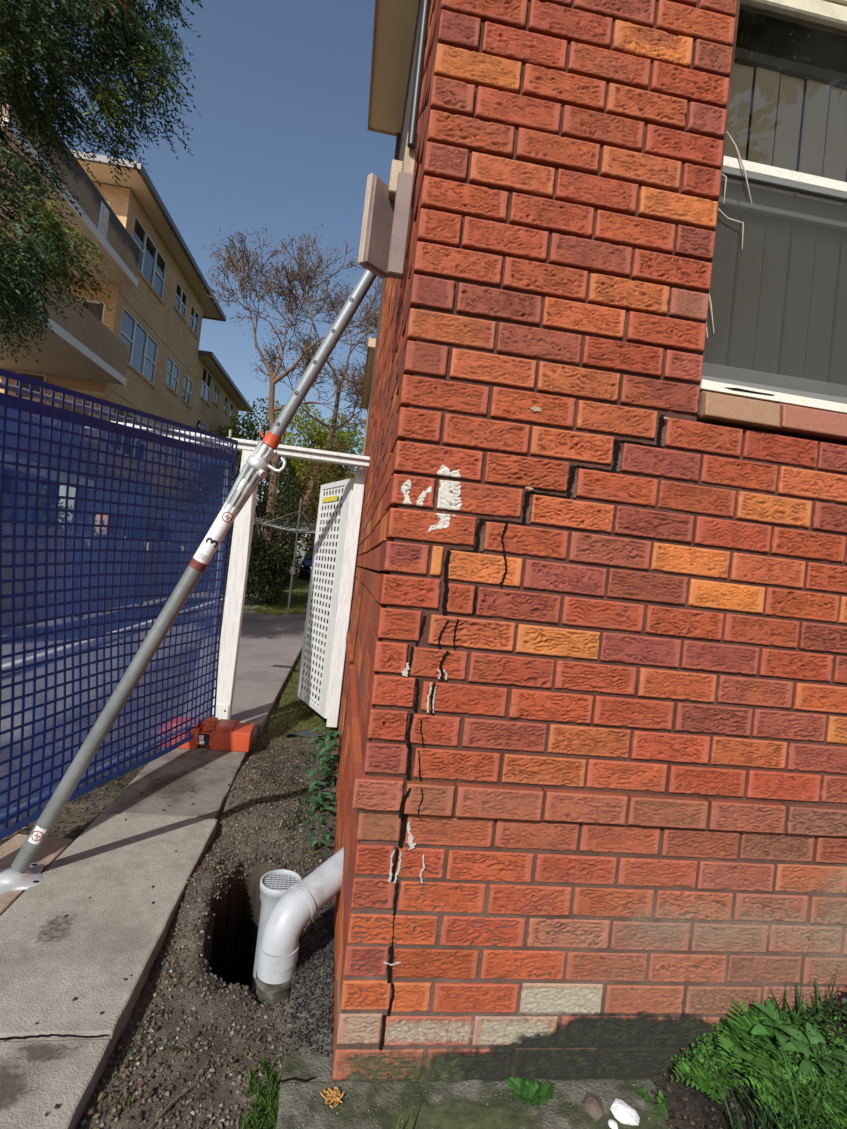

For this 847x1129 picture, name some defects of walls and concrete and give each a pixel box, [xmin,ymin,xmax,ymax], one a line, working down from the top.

crack [379,415,667,1050]
damp [342,988,722,1084]